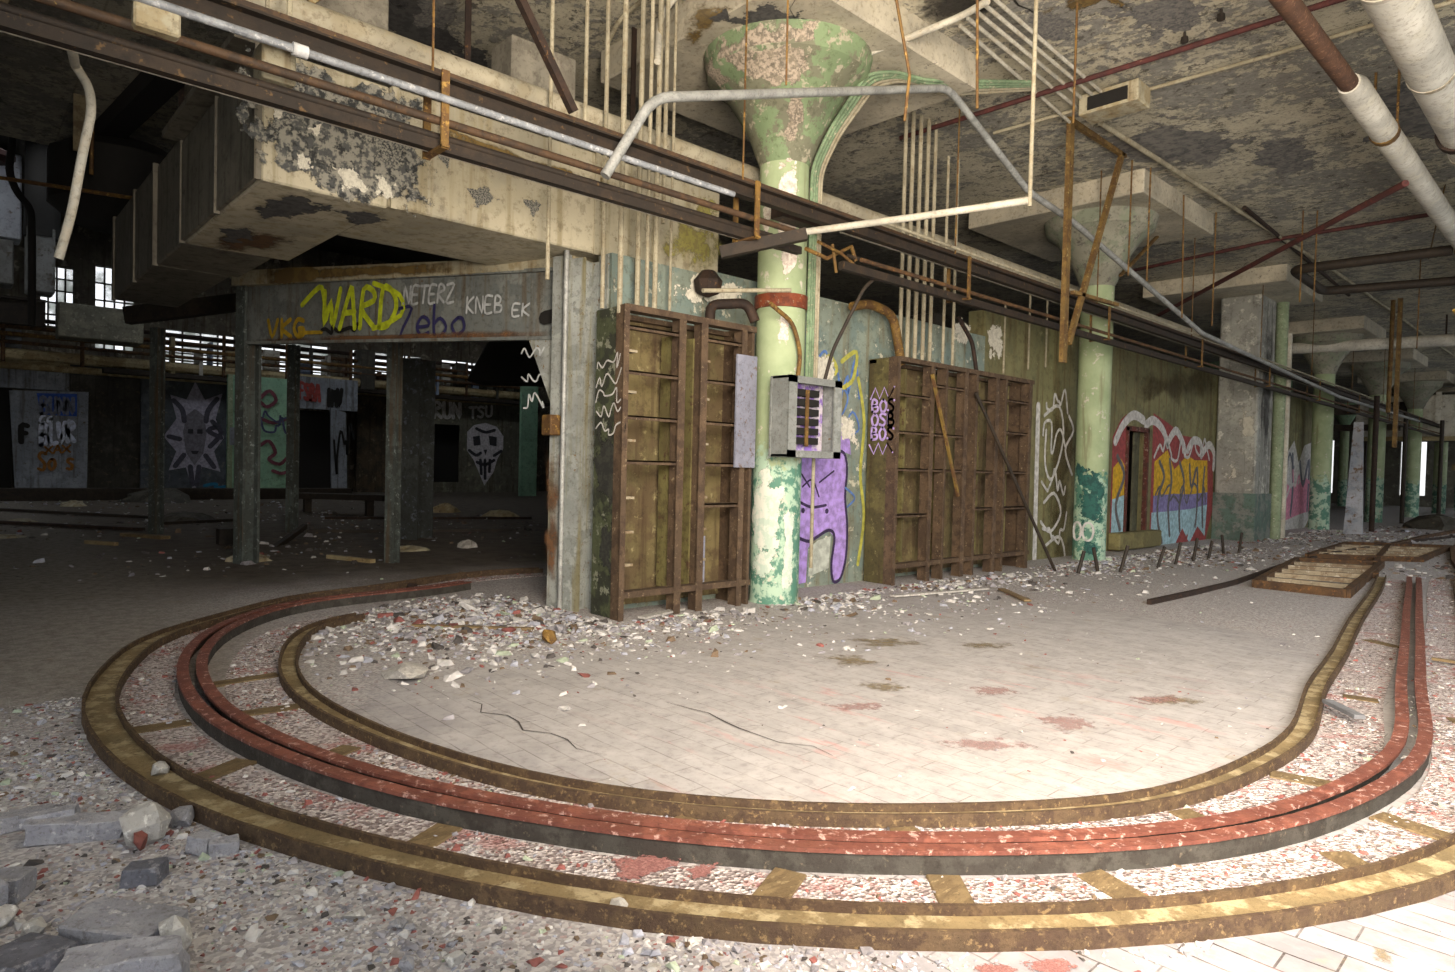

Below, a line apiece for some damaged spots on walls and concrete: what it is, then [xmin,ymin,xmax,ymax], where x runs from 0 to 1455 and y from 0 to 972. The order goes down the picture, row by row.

peeling [1019,5,1074,42]
peeling [1100,0,1224,41]
peeling [293,59,423,124]
peeling [687,2,822,195]
peeling [1377,82,1435,140]
peeling [218,100,450,243]
peeling [467,185,500,208]
peeling [762,207,797,233]
peeling [1086,113,1324,178]
peeling [781,251,798,280]
peeling [752,456,794,590]
peeling [1076,460,1104,555]